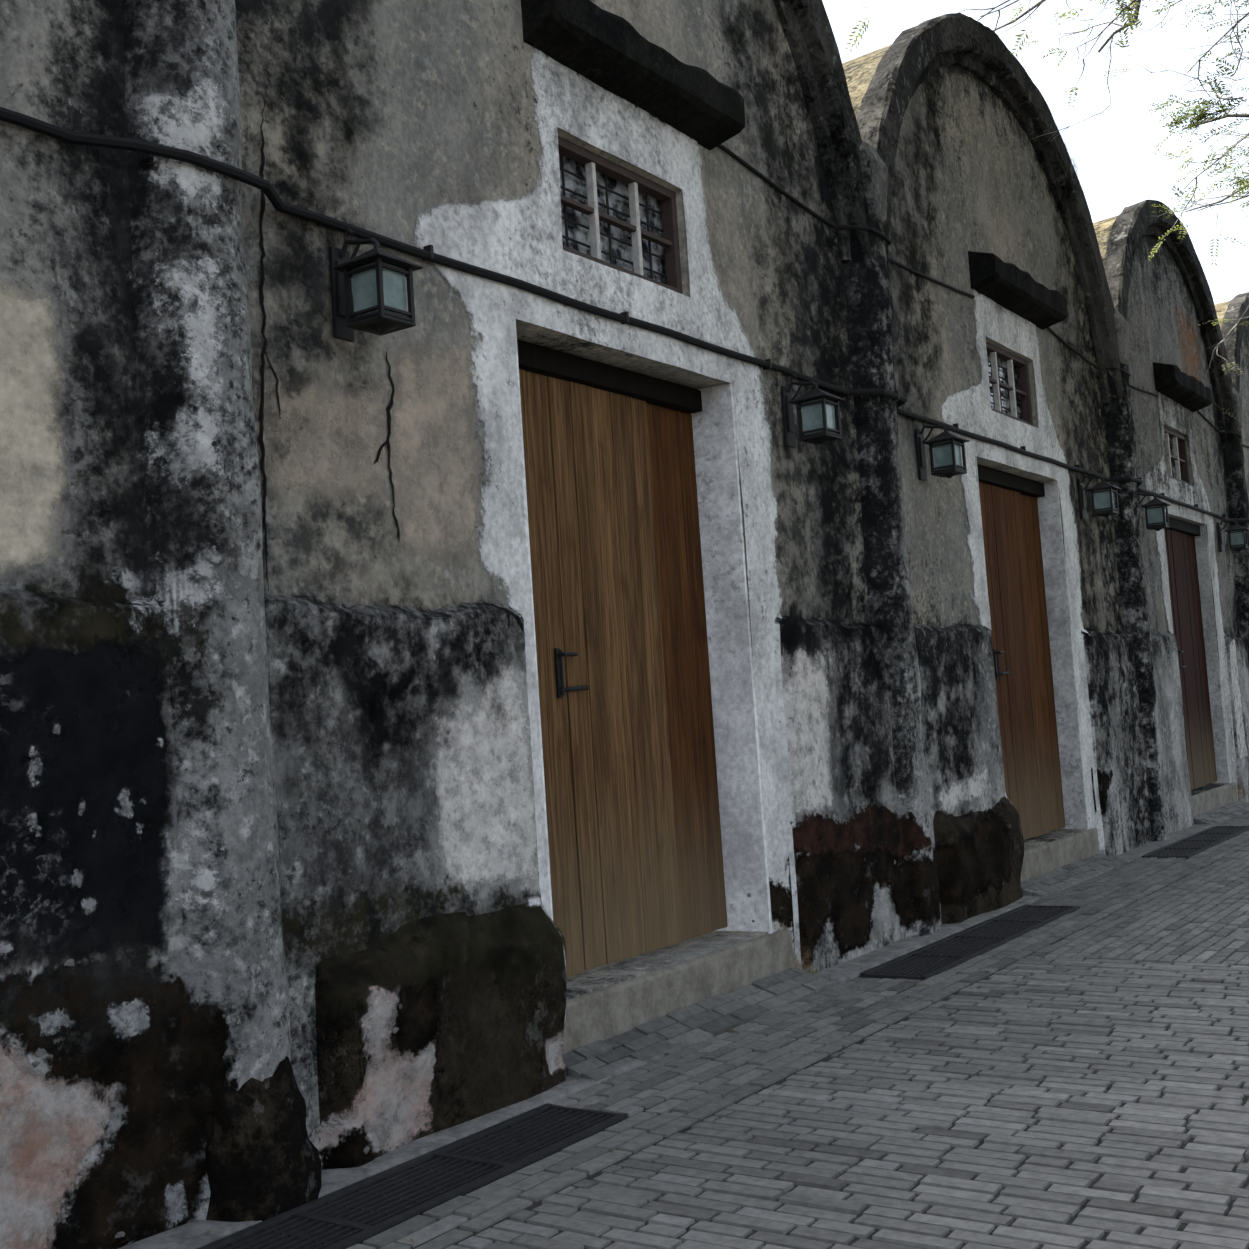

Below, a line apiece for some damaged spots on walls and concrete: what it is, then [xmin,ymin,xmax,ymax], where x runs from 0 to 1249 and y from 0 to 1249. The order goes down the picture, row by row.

water stain [70,0,174,318]
water stain [268,0,371,169]
water stain [71,298,183,440]
water stain [77,443,193,616]
water stain [266,224,331,394]
crack [373,351,400,542]
water stain [725,0,981,841]
water stain [1050,187,1158,846]
water stain [269,597,525,892]
spalling [0,940,241,1249]